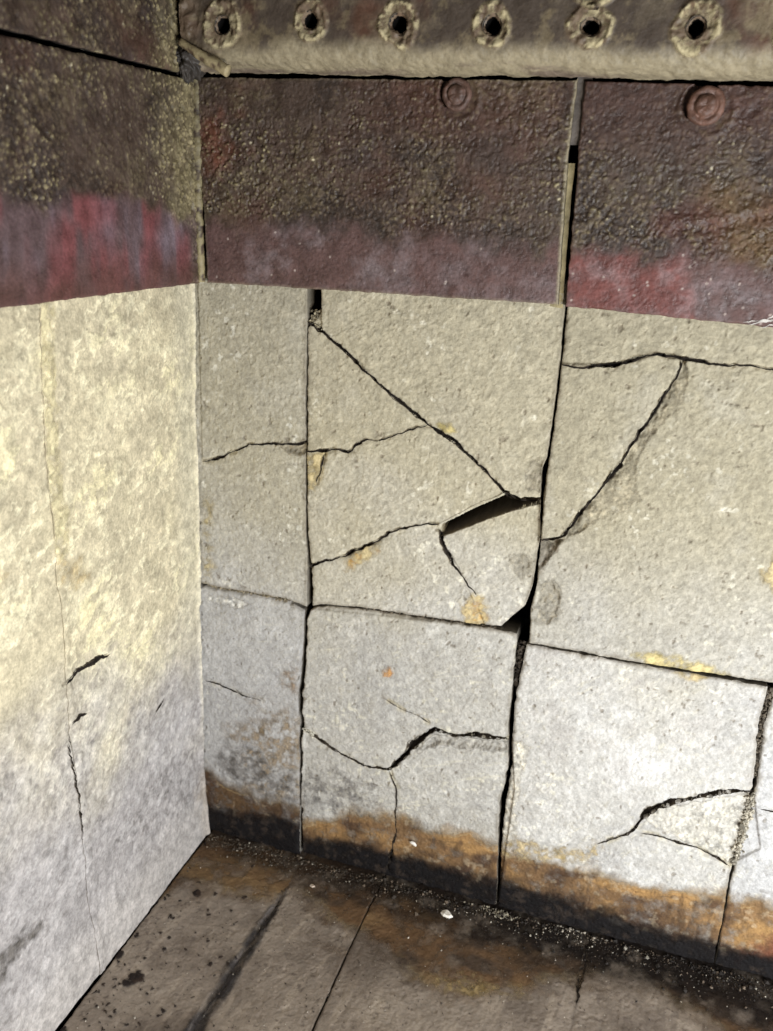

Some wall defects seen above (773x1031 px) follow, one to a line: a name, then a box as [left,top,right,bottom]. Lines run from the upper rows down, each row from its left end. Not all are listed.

crack [202,322,545,595]
crack [540,353,773,541]
crack [67,655,109,684]
crack [68,713,87,840]
crack [302,700,508,870]
crack [599,789,773,866]